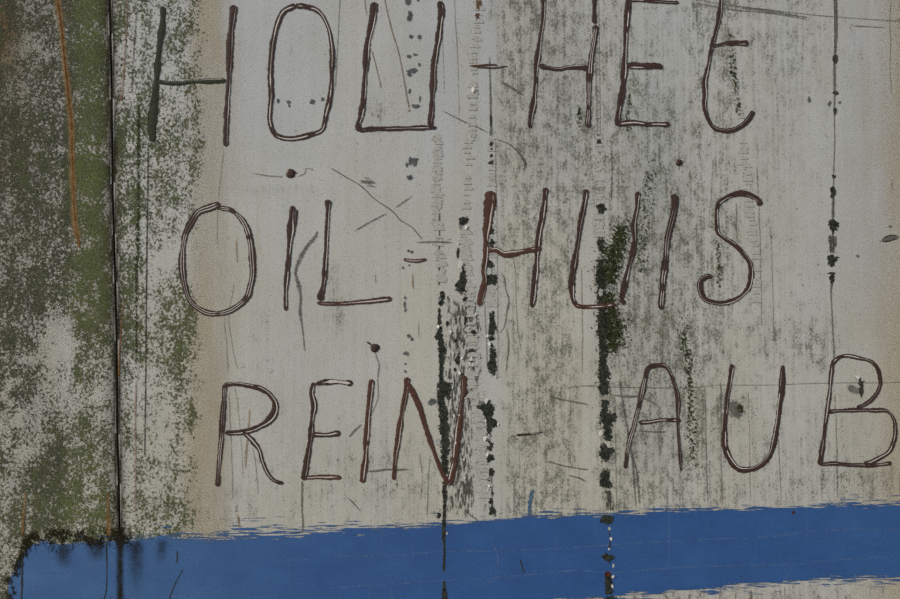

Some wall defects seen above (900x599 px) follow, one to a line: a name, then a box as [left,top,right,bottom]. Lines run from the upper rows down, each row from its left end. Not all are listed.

rust [55,0,80,247]
water stain [131,19,149,510]
crack [827,0,839,359]